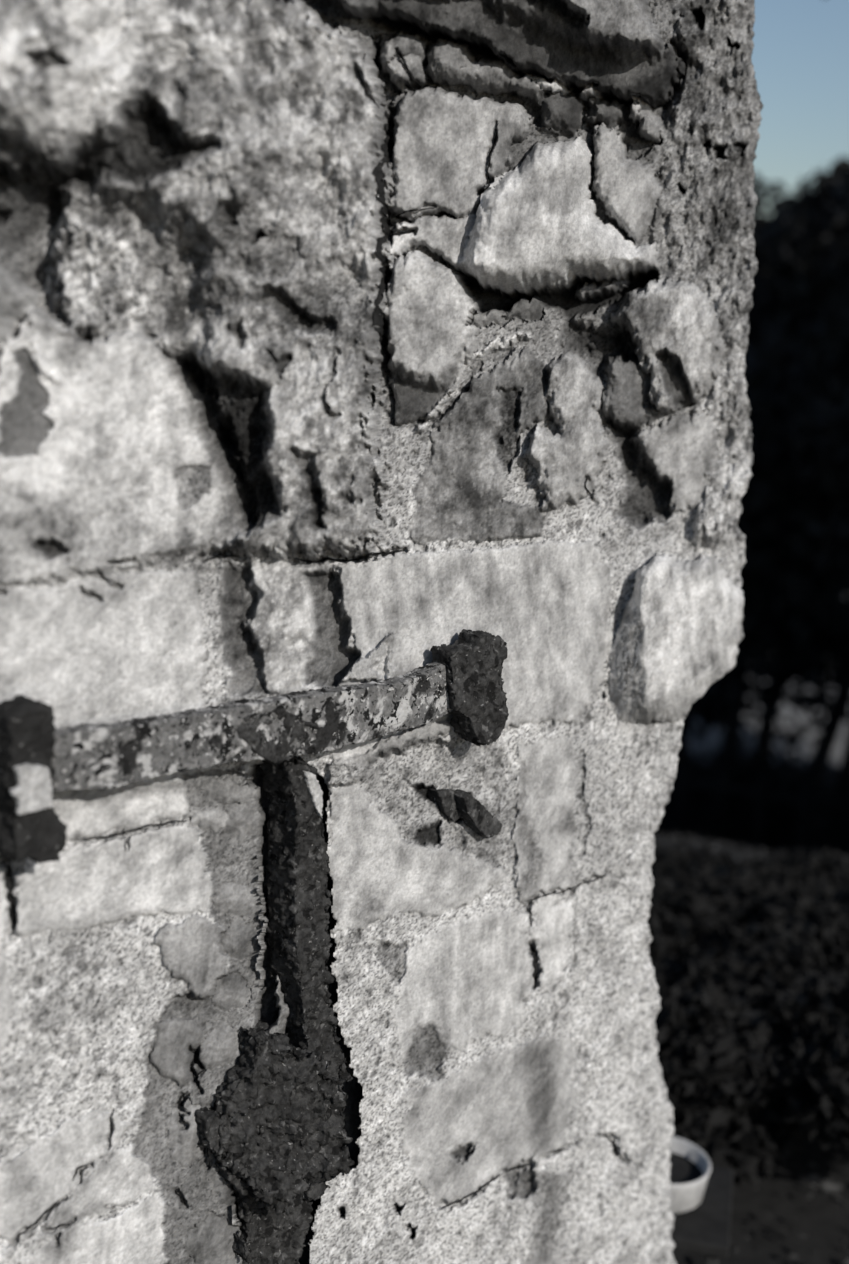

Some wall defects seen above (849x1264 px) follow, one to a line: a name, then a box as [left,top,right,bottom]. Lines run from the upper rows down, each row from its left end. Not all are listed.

corrosion [194,1106,253,1196]
crack [601,1134,624,1161]
crack [439,1148,568,1211]
corrosion [302,1180,331,1233]
corrosion [232,1211,251,1263]